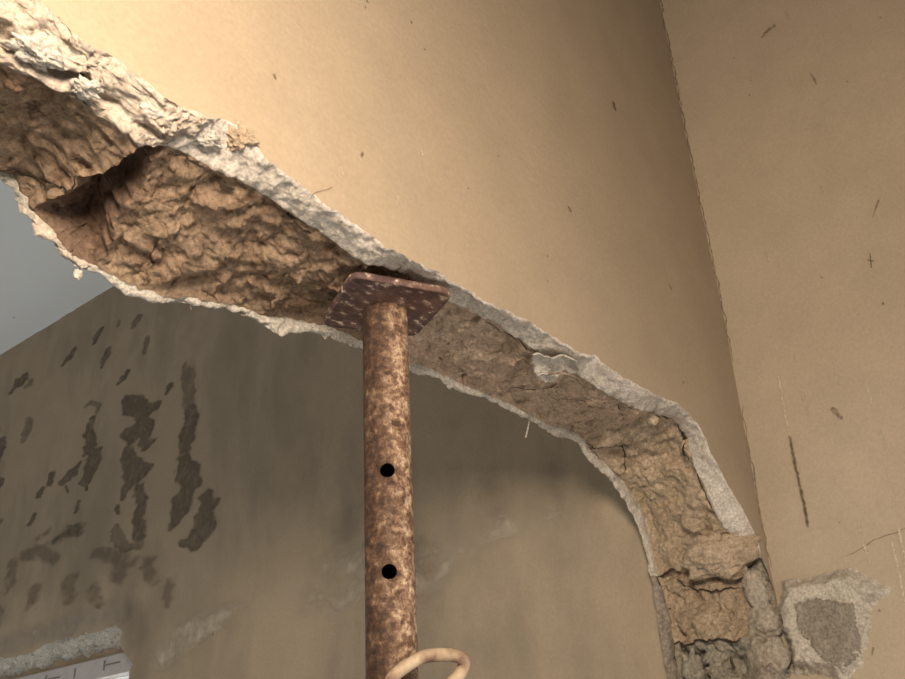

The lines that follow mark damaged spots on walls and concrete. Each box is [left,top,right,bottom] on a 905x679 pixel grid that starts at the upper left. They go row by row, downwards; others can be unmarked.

spalling [0,0,414,349]
crack [660,0,733,360]
spalling [403,261,756,679]
crack [742,408,771,564]
spalling [0,624,122,677]
crack [656,568,739,609]
spalling [747,543,779,612]